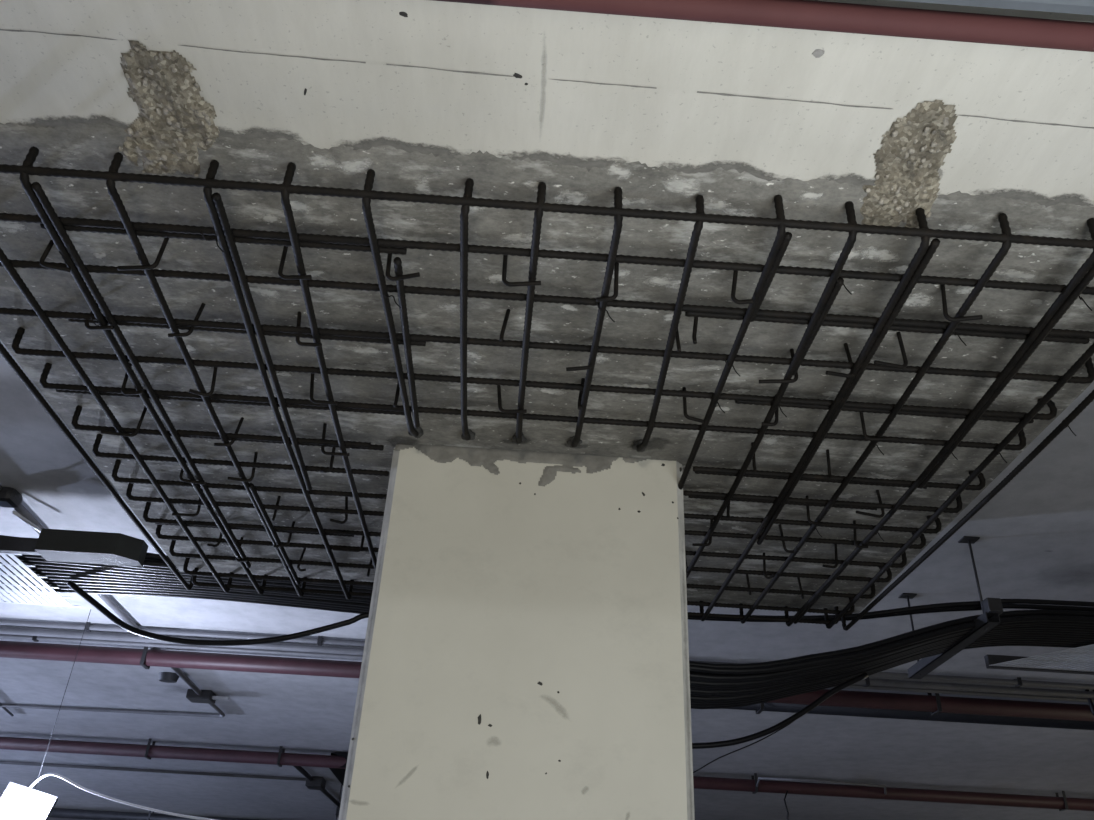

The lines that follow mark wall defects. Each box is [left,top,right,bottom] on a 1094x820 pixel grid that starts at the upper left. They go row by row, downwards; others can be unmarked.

spalling [0,115,1094,631]